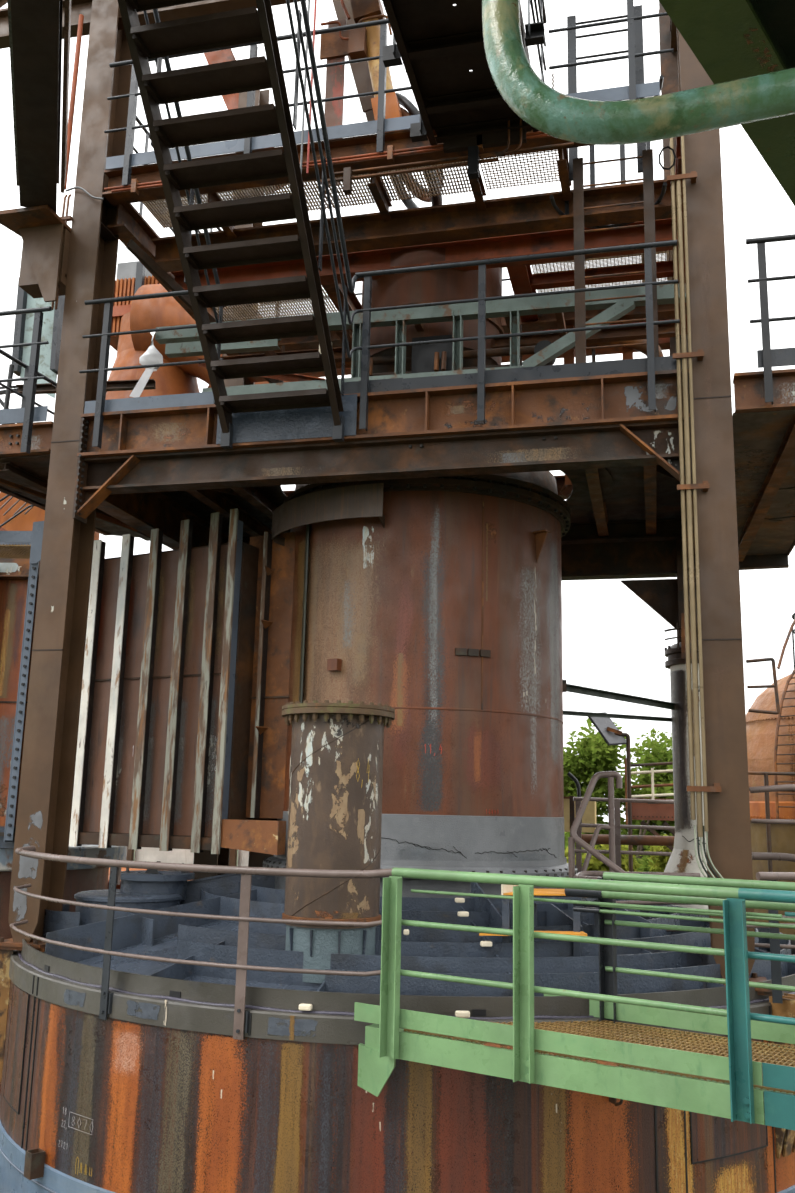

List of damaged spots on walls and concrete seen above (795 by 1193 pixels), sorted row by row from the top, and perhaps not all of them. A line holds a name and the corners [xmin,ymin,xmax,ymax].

peeling [624,384,677,412]
peeling [362,526,374,568]
rust [0,583,25,698]
rust [96,571,110,672]
rust [125,570,136,665]
rust [384,644,414,743]
peeling [288,719,379,868]
crack [381,837,557,861]
rust [36,1002,73,1168]
rust [96,1018,151,1193]
rust [187,1033,259,1193]
rust [339,1046,400,1193]